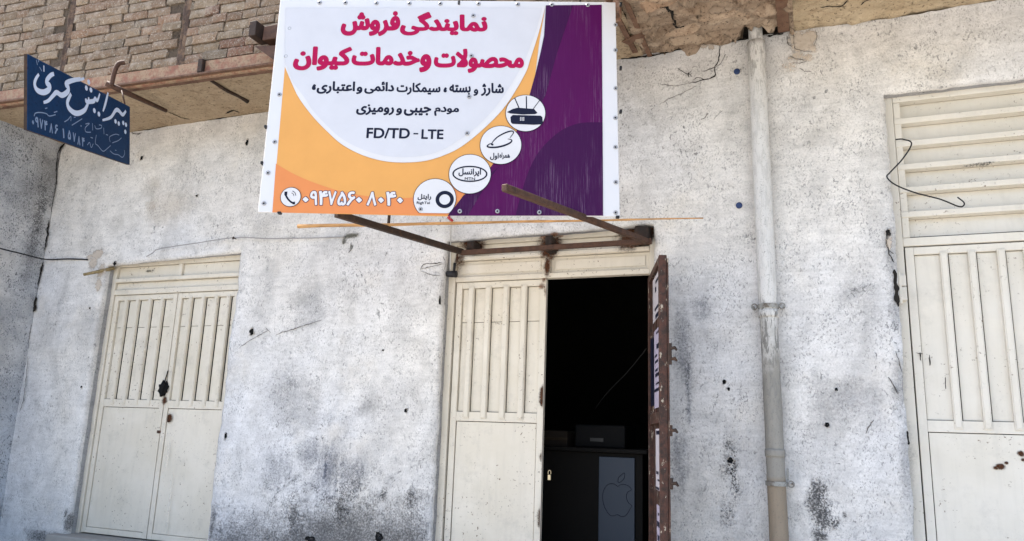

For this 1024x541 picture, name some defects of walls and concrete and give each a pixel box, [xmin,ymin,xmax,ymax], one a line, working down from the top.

crack [622,6,783,103]
corrosion [455,241,485,268]
water stain [805,479,846,541]